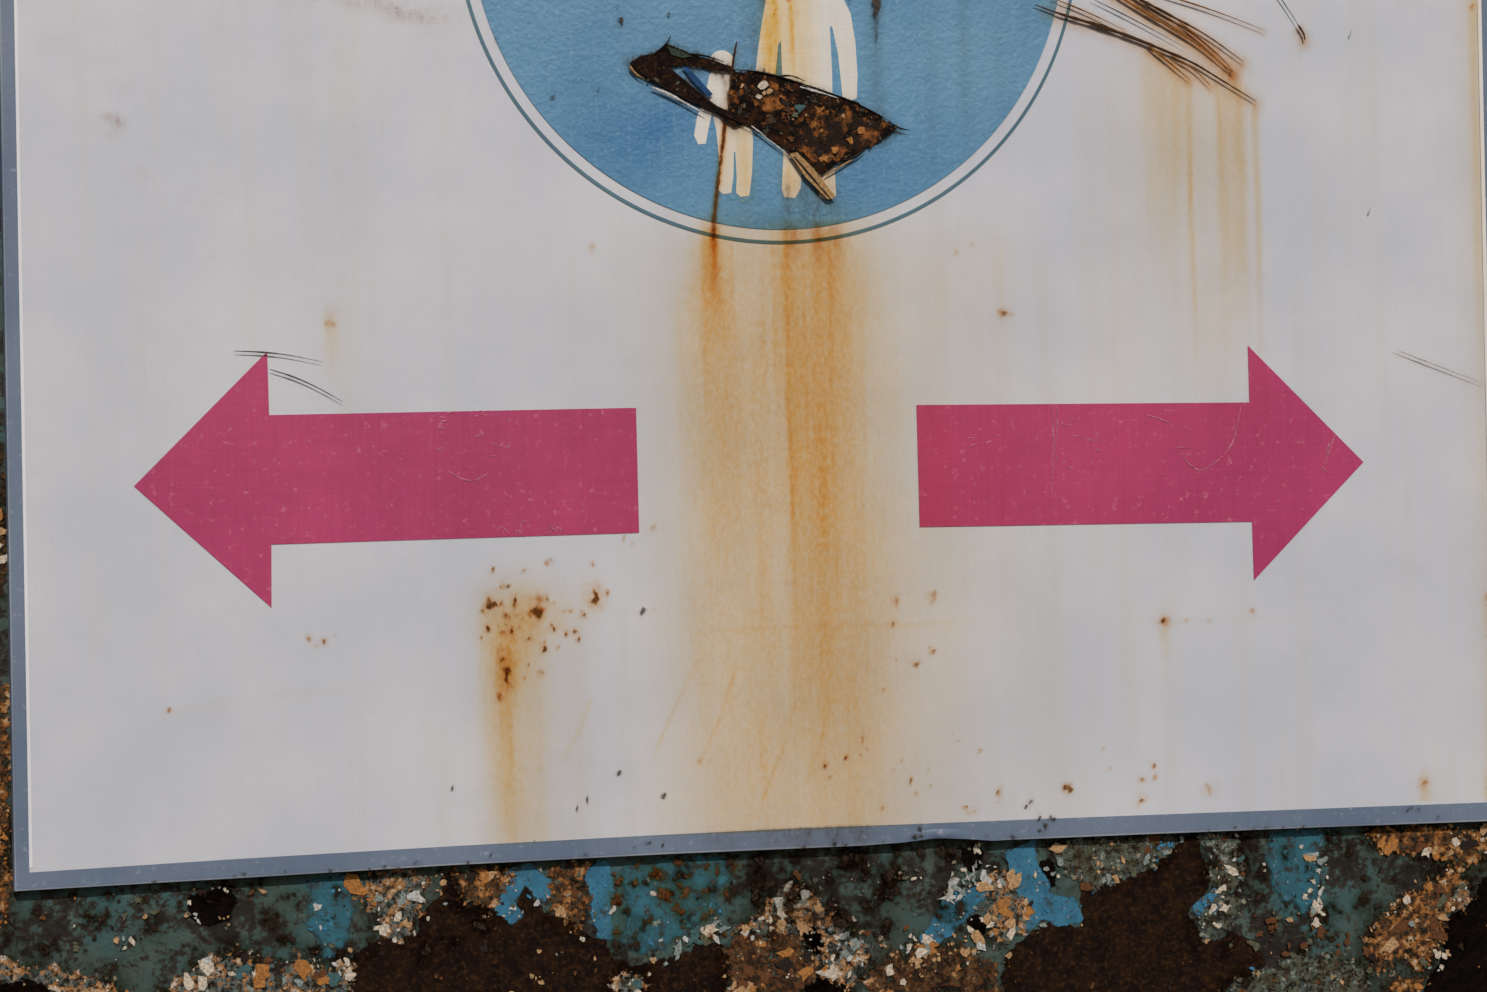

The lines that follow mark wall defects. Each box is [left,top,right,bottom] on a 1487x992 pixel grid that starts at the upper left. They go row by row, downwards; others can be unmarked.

rust [486,585,580,640]
peeling [0,680,160,992]
peeling [157,833,1177,992]
peeling [1193,821,1487,992]